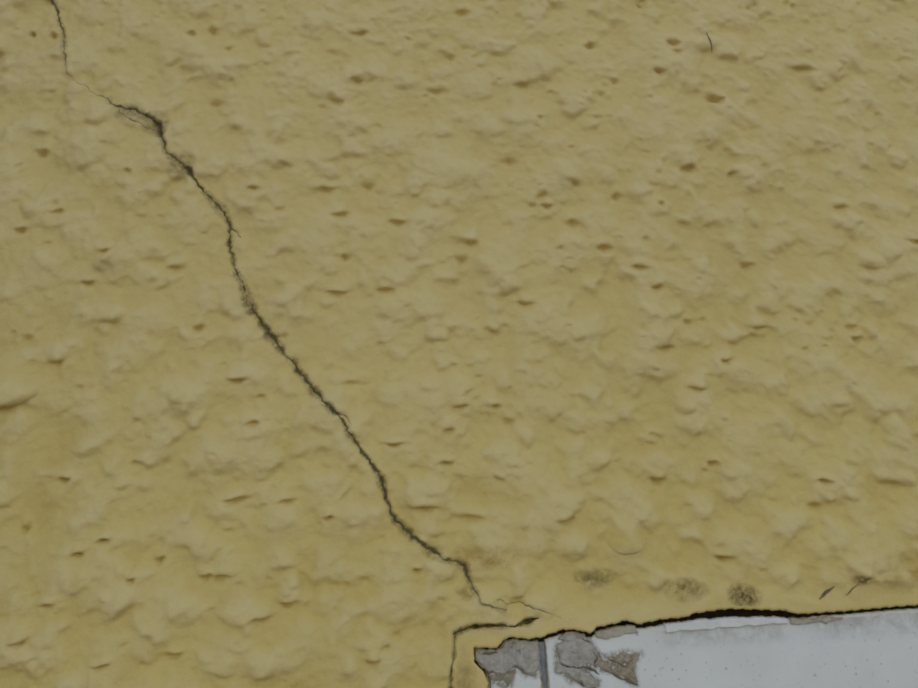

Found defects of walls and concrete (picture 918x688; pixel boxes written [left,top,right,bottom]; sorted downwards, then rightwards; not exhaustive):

crack [51,0,560,688]
peeling [663,616,843,634]
spalling [595,651,640,686]